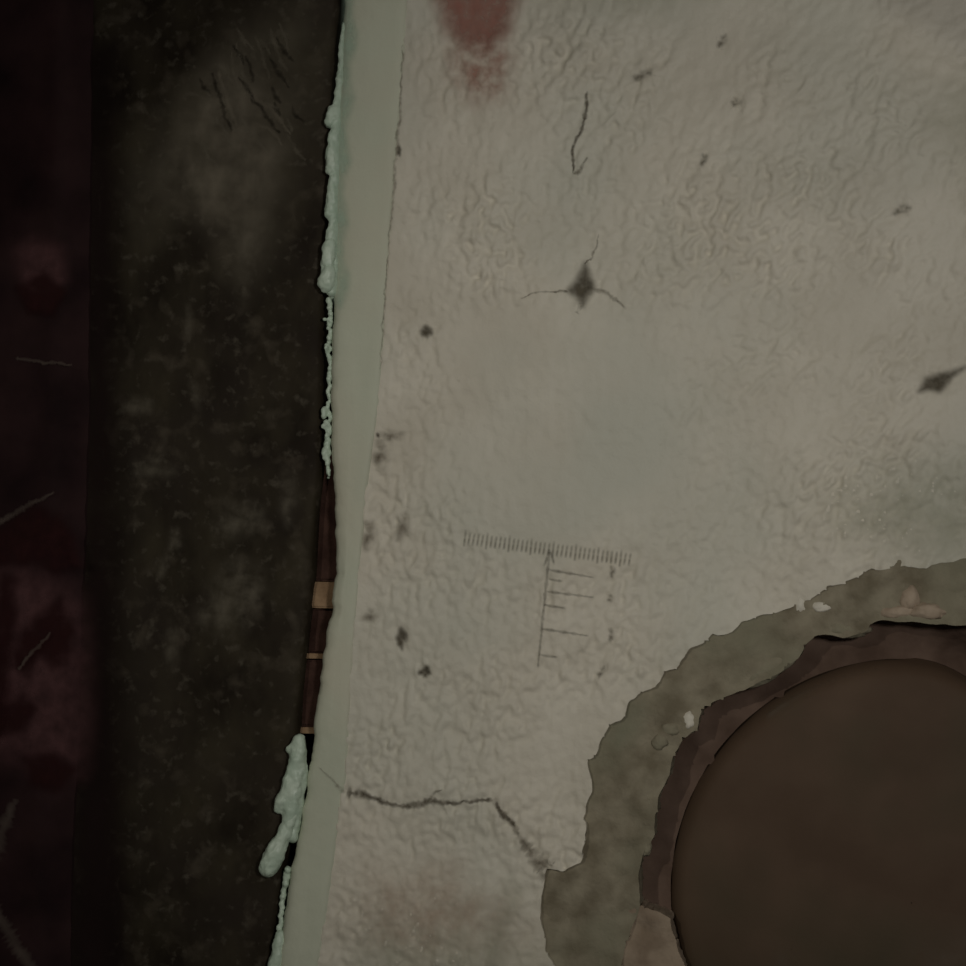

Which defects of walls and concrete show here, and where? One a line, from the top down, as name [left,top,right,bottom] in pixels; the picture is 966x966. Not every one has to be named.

leakage [443,0,510,44]
crack [571,94,588,173]
spalling [541,558,966,966]
crack [349,792,543,865]